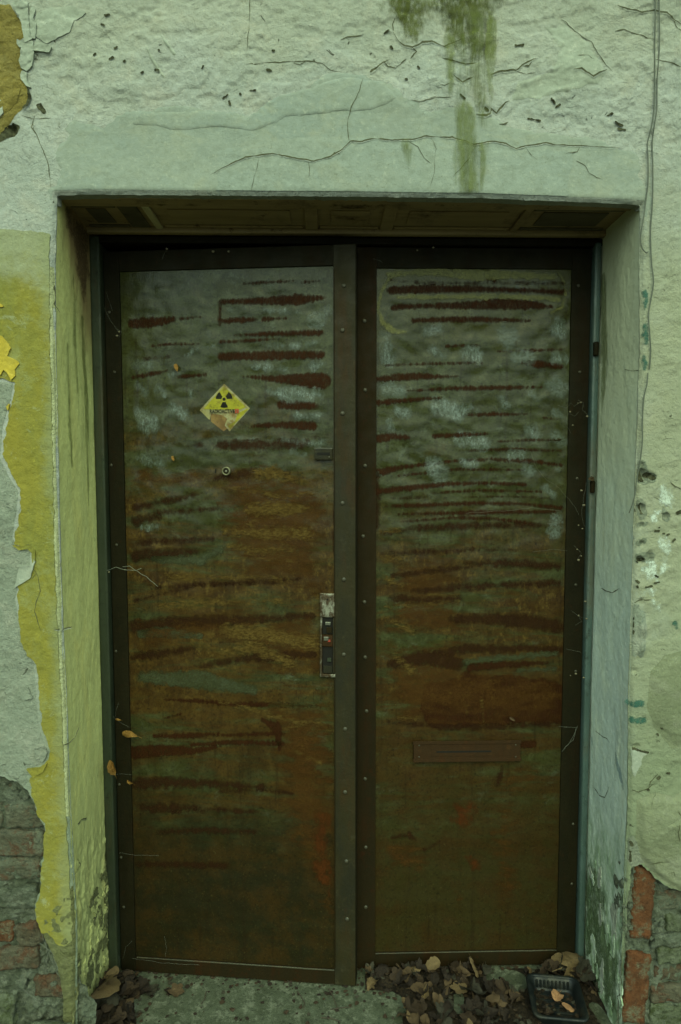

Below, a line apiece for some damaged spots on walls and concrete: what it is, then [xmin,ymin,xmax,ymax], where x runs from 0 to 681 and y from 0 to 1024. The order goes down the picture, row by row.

flaking render [0,1,52,142]
crack [210,0,617,185]
leakage [389,0,500,192]
crack [22,115,51,186]
rust [217,280,325,361]
rust [387,277,567,323]
rust [376,362,542,406]
rust [376,439,563,534]
spalling [637,460,657,485]
spalling [635,499,681,563]
peeling [0,229,109,1024]
spalling [586,836,681,1024]